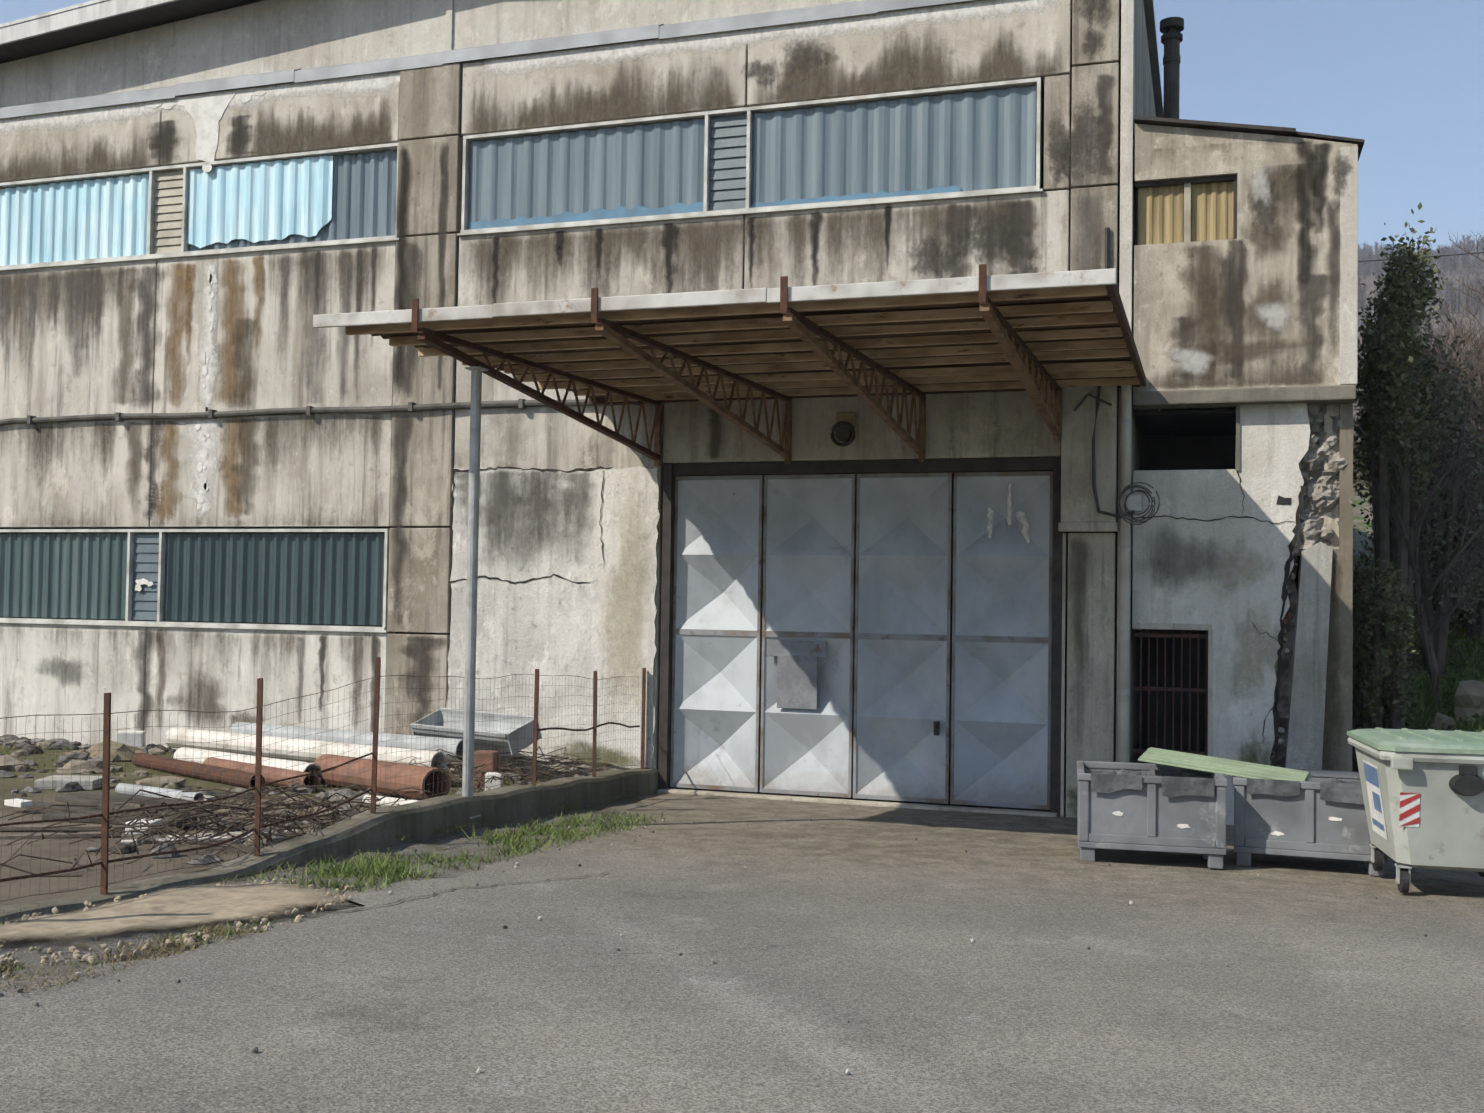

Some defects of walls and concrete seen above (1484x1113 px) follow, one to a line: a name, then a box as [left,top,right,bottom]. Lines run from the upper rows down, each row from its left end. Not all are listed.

damp [0,120,174,182]
damp [472,71,733,132]
damp [746,39,1056,103]
damp [1078,0,1107,54]
damp [473,200,1036,304]
damp [1157,142,1350,388]
damp [0,267,159,405]
efflorescence [185,263,220,516]
damp [94,421,164,525]
crack [449,466,613,584]
crack [1138,468,1306,767]
spalling [1270,403,1353,768]